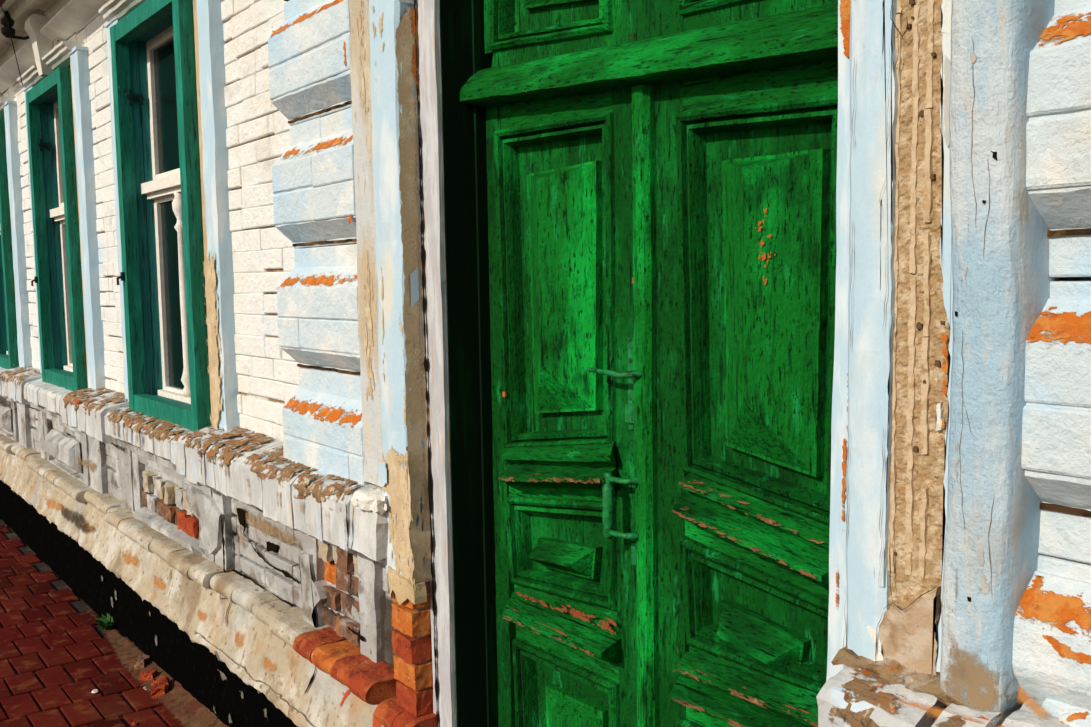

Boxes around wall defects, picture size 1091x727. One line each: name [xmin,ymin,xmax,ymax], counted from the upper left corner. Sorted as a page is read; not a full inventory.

peeling [840,0,851,57]
peeling [1037,12,1091,46]
flaking render [61,0,439,727]
flaking render [874,0,967,672]
peeling [1027,306,1091,349]
peeling [967,549,990,602]
peeling [1015,575,1091,664]
spalling [782,667,904,727]
spalling [936,715,1004,727]
peeling [1055,711,1088,727]